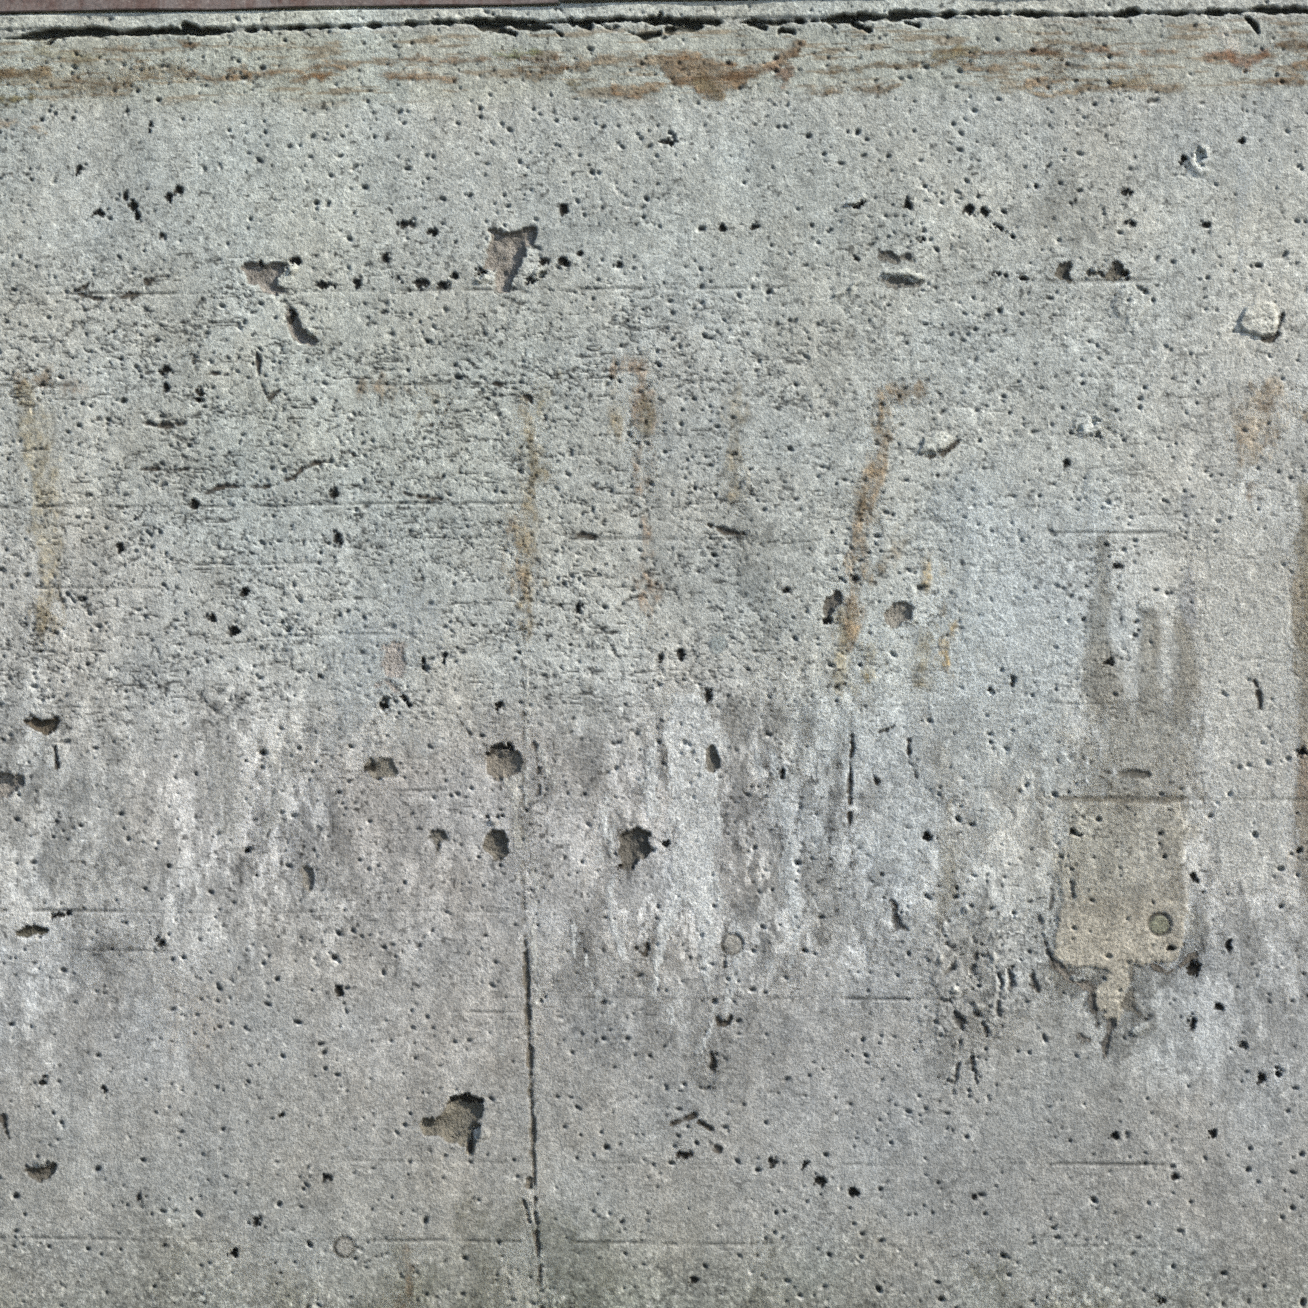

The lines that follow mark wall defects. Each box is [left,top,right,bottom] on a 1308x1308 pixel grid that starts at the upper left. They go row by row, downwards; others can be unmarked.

crack [12,7,1308,45]
rust [0,53,77,105]
rust [184,60,347,81]
rust [385,40,806,98]
rust [914,44,1178,97]
rust [1207,42,1308,82]
spalling [475,226,549,293]
water stain [813,468,1308,933]
spalling [485,743,523,781]
spalling [617,827,670,870]
peeling [918,874,1208,1082]
spalling [419,1093,489,1156]